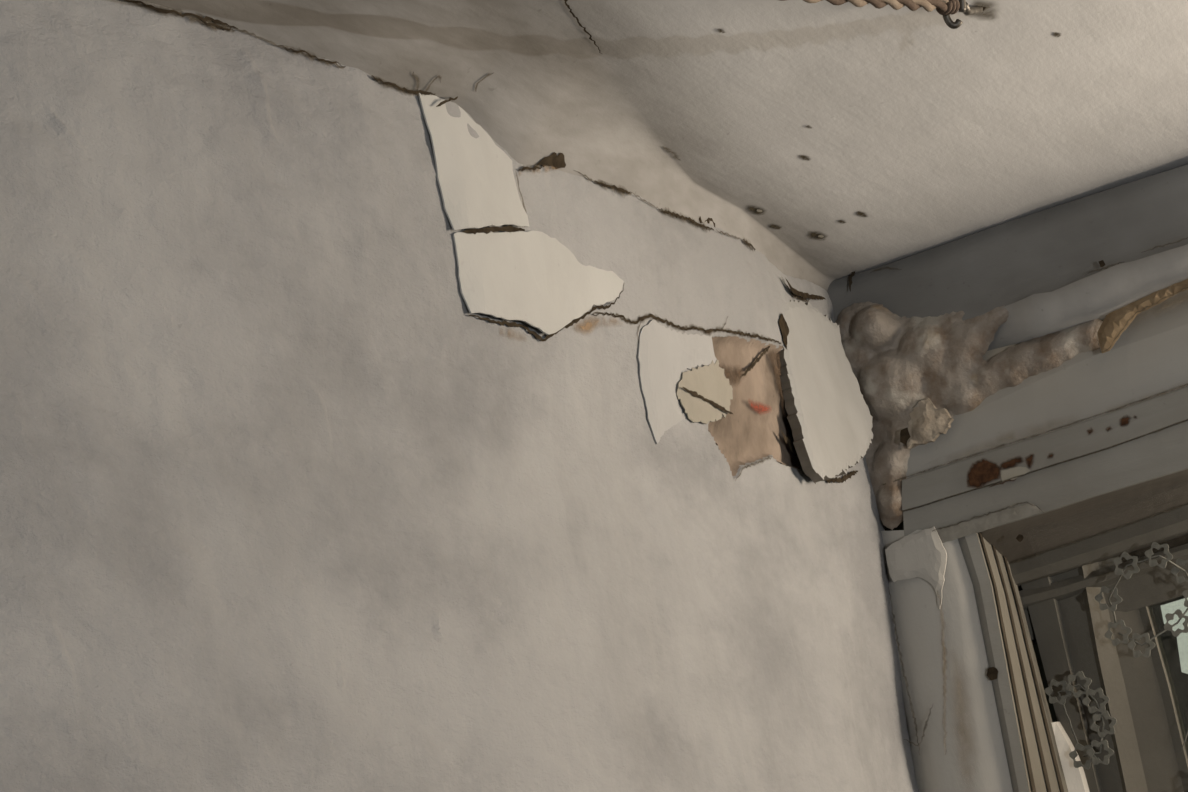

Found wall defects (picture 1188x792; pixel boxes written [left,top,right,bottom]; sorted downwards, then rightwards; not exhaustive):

crack [124,0,493,107]
crack [564,0,602,54]
peeling [418,93,624,342]
crack [519,152,756,250]
crack [592,312,781,344]
crack [781,267,901,302]
spalling [637,319,803,478]
rust [967,454,1034,488]